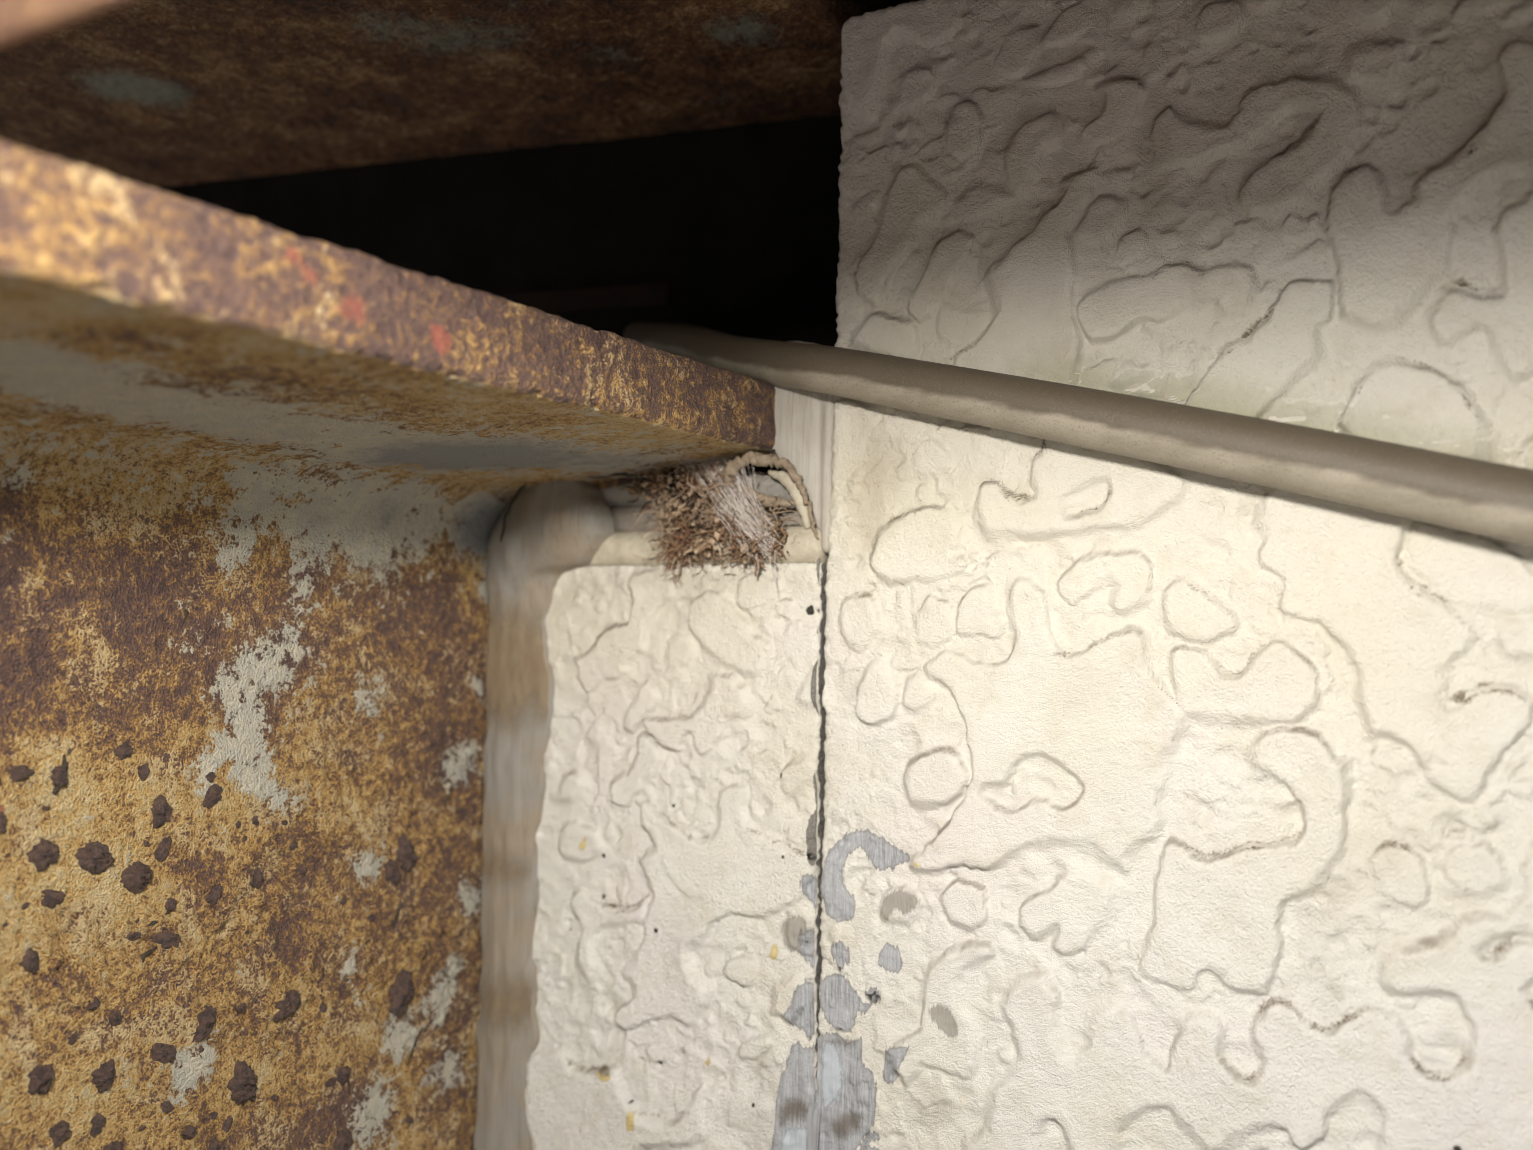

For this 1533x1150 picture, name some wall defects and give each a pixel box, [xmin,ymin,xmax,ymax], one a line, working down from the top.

rust [486,613,549,718]
rust [0,748,72,788]
rust [202,772,223,809]
rust [26,794,173,894]
rust [21,889,67,909]
peeling [881,891,918,920]
peeling [771,774,910,1150]
rust [150,1005,217,1064]
rust [27,1063,55,1096]
rust [91,1059,116,1093]
rust [181,1060,279,1150]
rust [49,1113,124,1150]